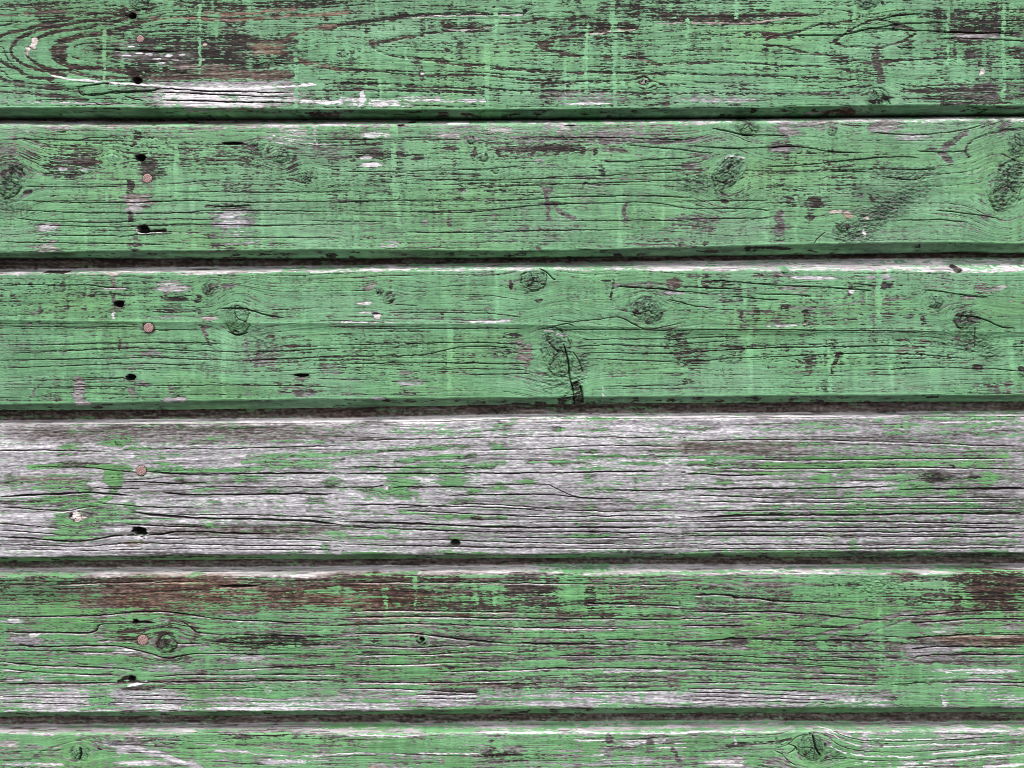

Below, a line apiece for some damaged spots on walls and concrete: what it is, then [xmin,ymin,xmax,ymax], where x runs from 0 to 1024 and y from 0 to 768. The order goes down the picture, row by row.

peeling [337,11,525,29]
peeling [652,13,781,37]
peeling [938,6,1013,40]
peeling [106,29,305,112]
peeling [917,77,1024,105]
peeling [474,125,673,153]
crack [557,350,584,404]
peeling [110,618,328,664]
peeling [0,689,191,713]
peeling [411,689,477,709]
peeling [644,690,861,708]
peeling [91,736,203,768]